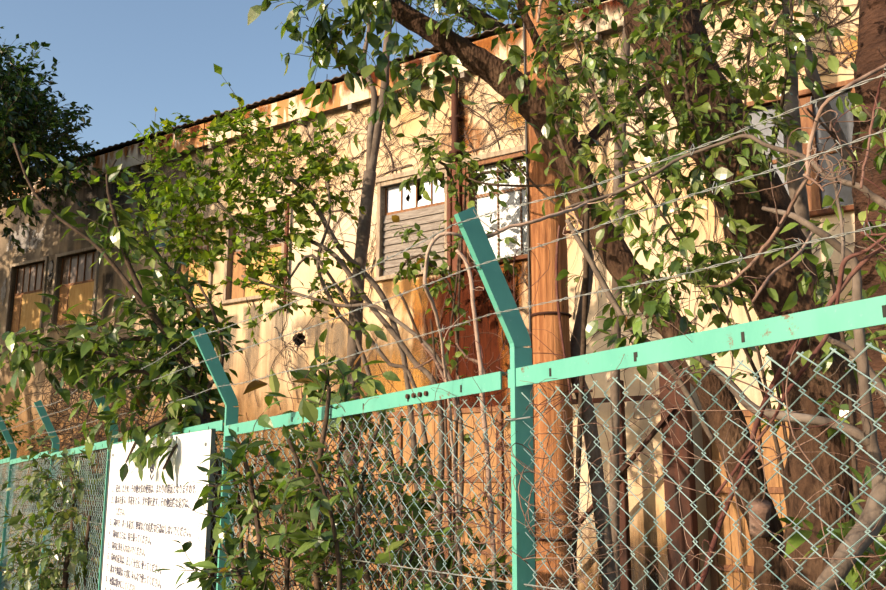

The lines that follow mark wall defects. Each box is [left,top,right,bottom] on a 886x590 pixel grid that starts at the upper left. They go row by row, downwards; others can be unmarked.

peeling [6,221,45,254]
spalling [291,321,318,350]